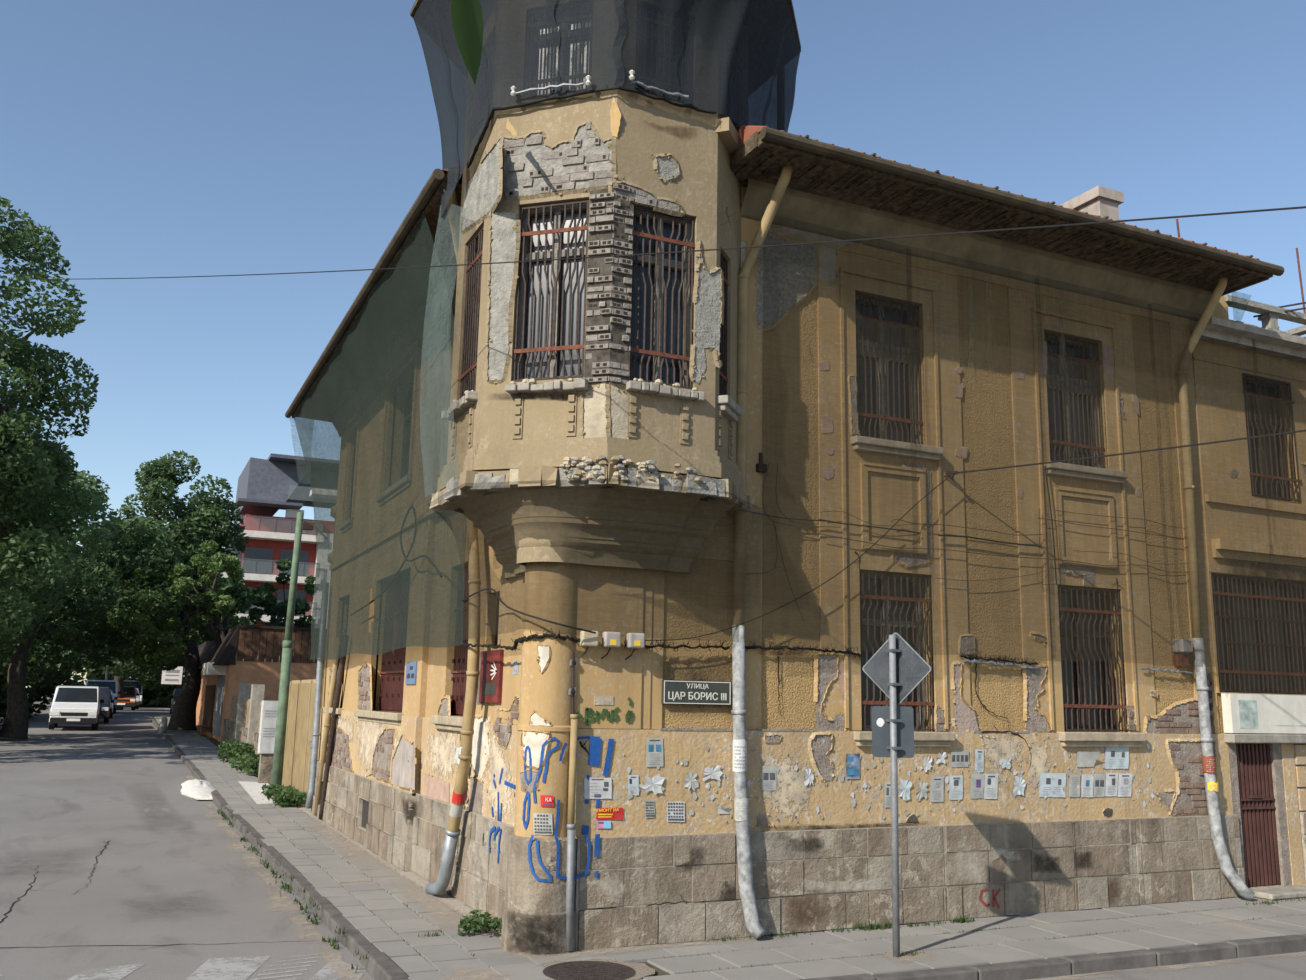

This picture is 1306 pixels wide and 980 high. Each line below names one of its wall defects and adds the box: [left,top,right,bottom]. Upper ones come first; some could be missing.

flaking render [460,97,685,439]
peeling [689,240,724,384]
peeling [741,224,863,332]
peeling [321,661,552,822]
peeling [753,651,850,828]
peeling [934,634,1055,795]
crack [975,663,1032,766]
flaking render [1126,670,1217,817]